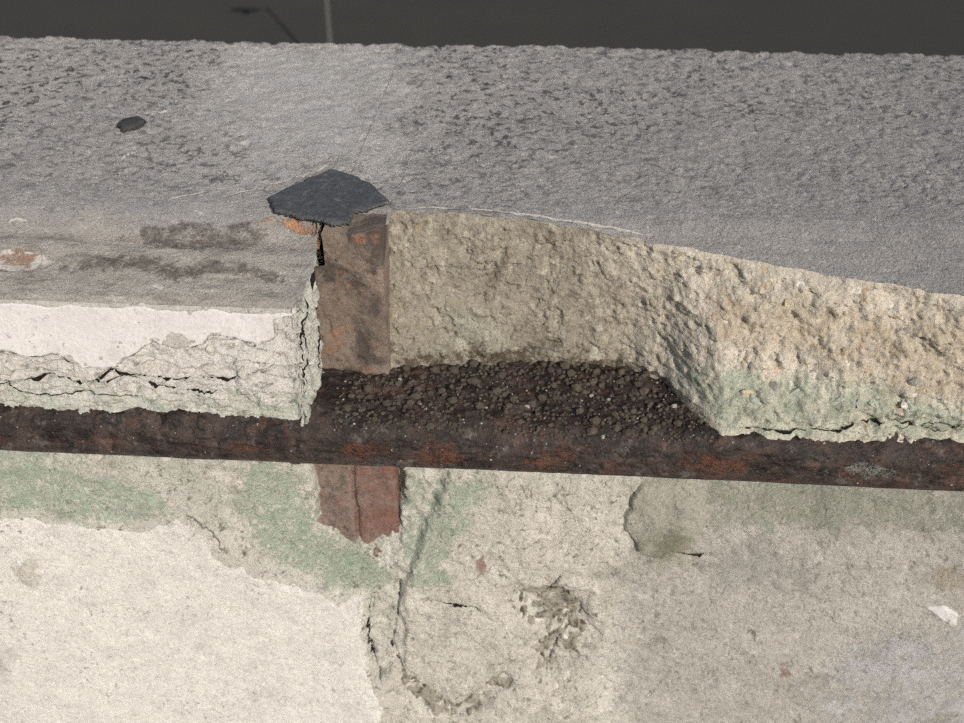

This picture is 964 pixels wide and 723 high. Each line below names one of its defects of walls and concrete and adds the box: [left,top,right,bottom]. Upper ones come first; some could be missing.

crack [0,365,273,397]
spalling [0,222,325,424]
crack [298,272,321,391]
spalling [369,207,964,444]
crack [738,418,961,435]